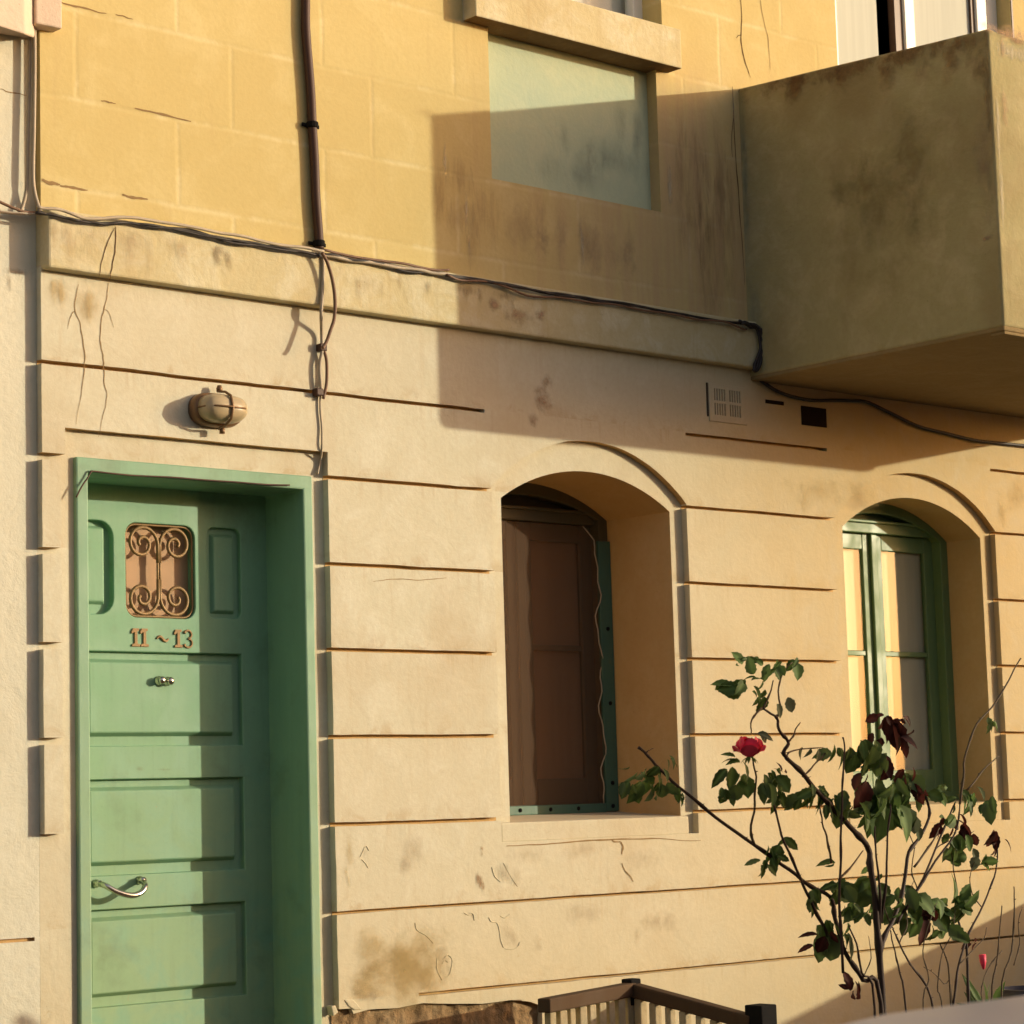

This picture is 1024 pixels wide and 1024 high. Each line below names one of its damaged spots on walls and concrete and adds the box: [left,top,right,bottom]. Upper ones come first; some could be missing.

crack [101,100,191,122]
crack [732,0,770,285]
crack [42,179,88,191]
crack [68,228,116,437]
crack [508,838,701,882]